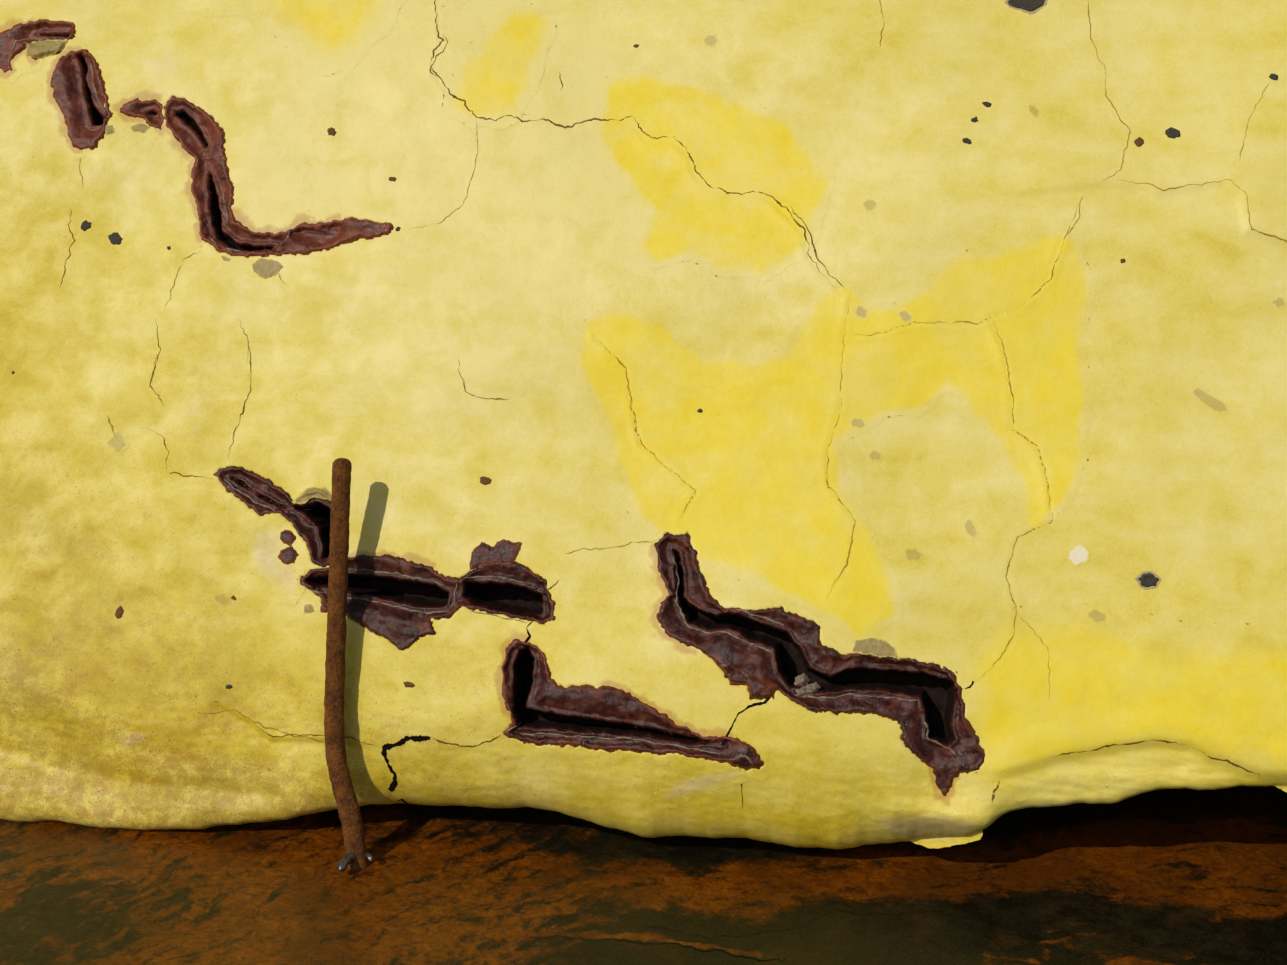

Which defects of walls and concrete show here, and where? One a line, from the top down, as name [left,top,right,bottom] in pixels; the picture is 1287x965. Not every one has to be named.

crack [1088,3,1287,242]
peeling [108,232,123,245]
crack [0,0,1082,808]
peeling [239,515,307,606]
rust [0,800,1287,965]